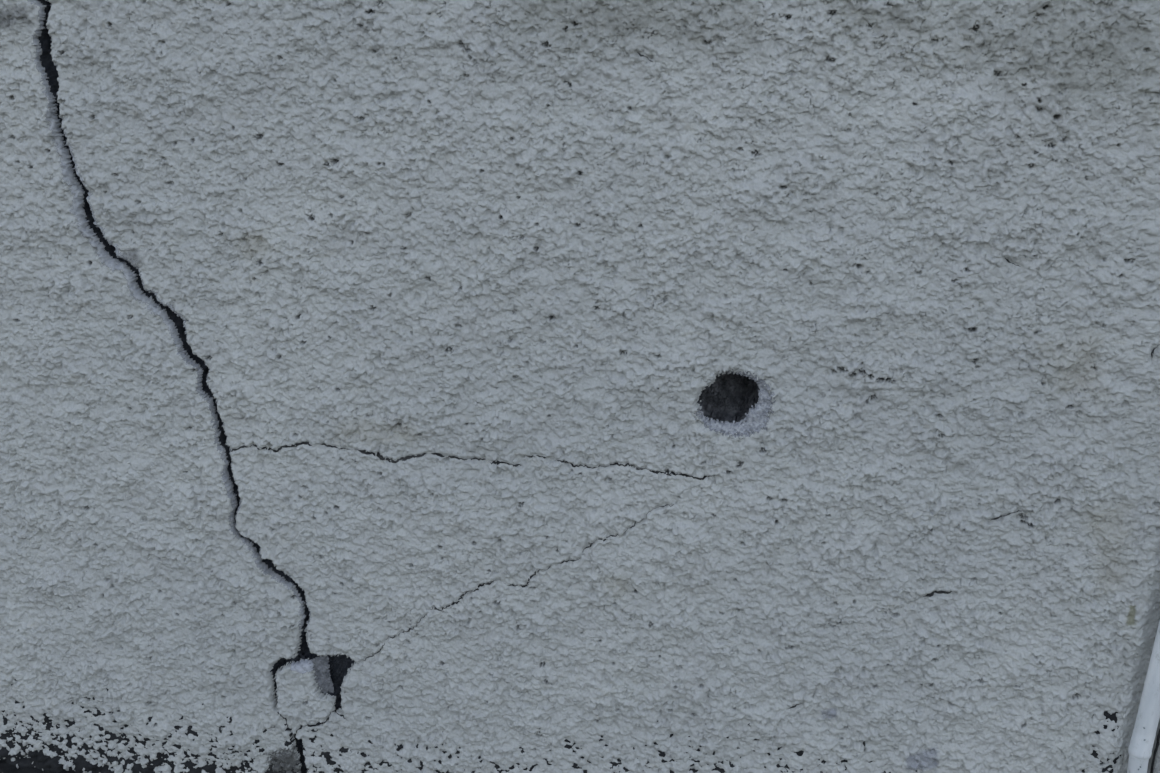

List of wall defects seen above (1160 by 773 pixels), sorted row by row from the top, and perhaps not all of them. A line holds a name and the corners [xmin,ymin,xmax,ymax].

crack [28,0,717,773]
spalling [695,371,776,439]
peeling [0,621,629,773]
peeling [633,736,804,773]
peeling [1082,711,1123,773]